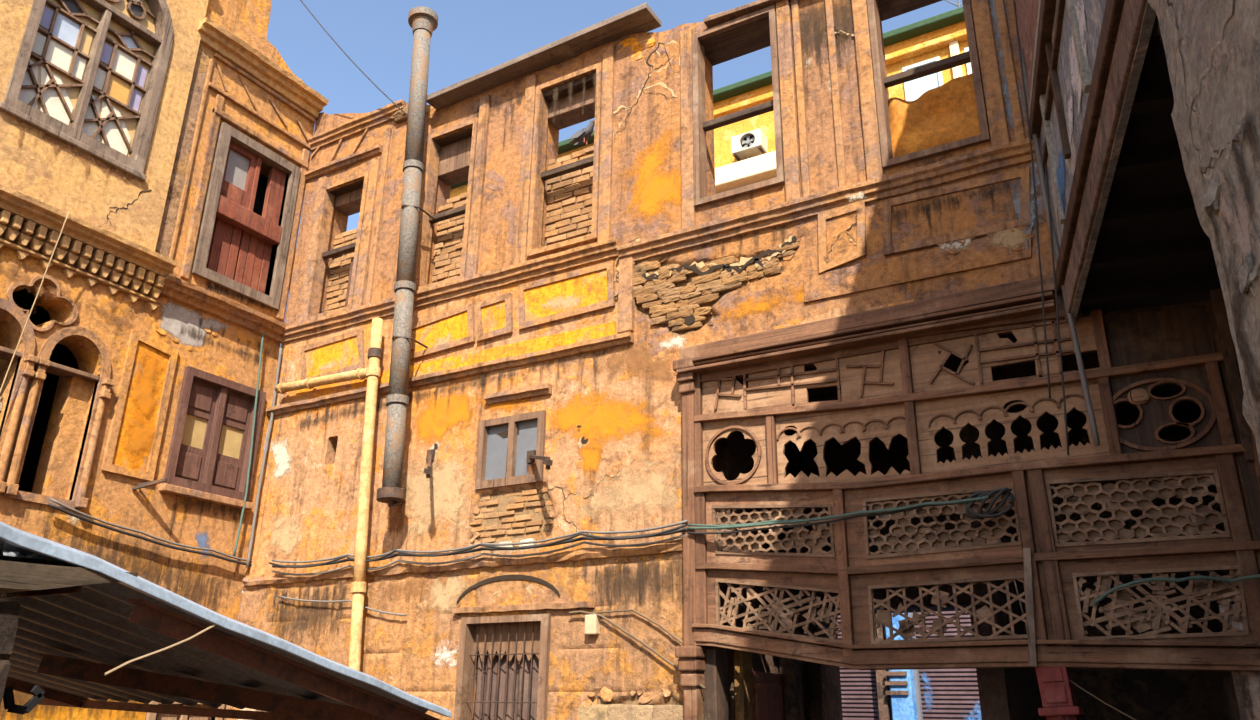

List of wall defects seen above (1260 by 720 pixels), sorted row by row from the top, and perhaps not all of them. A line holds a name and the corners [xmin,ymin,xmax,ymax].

crack [613,40,680,136]
crack [1167,0,1256,298]
crack [96,189,152,227]
peeling [155,297,227,351]
spalling [633,231,803,336]
spalling [466,488,558,546]